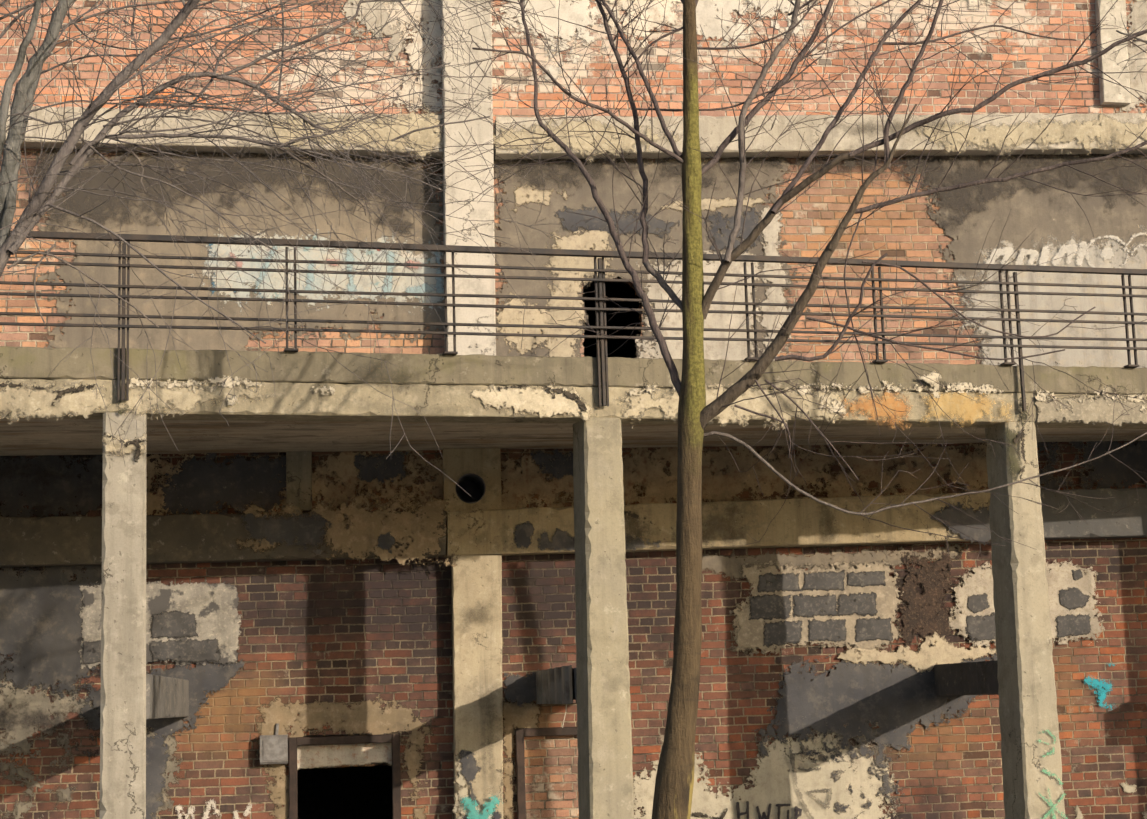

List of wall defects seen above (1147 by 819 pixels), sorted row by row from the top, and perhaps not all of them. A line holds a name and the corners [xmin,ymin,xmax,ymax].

peeling [541,64,562,80]
spalling [919,371,942,385]
peeling [0,379,274,420]
spalling [466,381,592,421]
peeling [618,383,679,428]
peeling [705,383,842,430]
peeling [158,453,286,515]
peeling [354,451,409,483]
peeling [377,532,395,554]
peeling [513,521,575,552]